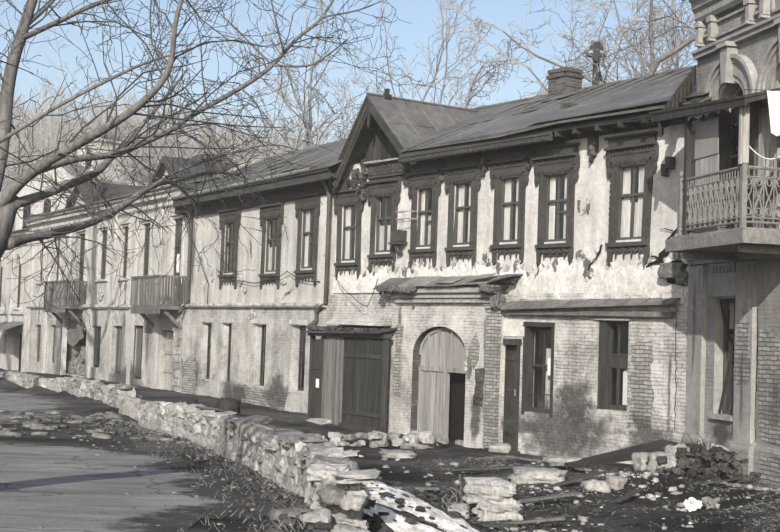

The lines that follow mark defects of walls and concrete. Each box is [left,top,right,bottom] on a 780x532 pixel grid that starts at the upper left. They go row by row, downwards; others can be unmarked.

spalling [577,196,590,215]
peeling [333,244,695,310]
flaking render [464,332,485,407]
flaking render [628,339,654,427]
flaking render [734,308,780,446]